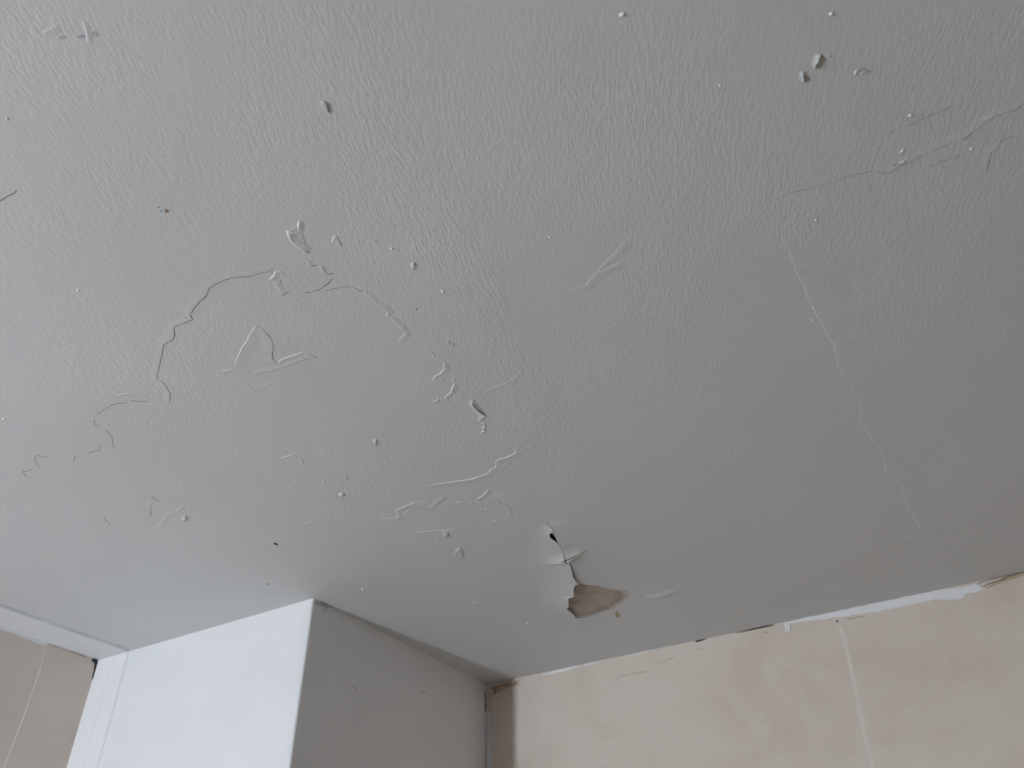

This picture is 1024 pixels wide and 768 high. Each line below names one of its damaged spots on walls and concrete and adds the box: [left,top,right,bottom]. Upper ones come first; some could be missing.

peeling [797,53,832,83]
crack [22,260,411,472]
peeling [467,399,488,434]
peeling [523,517,650,625]